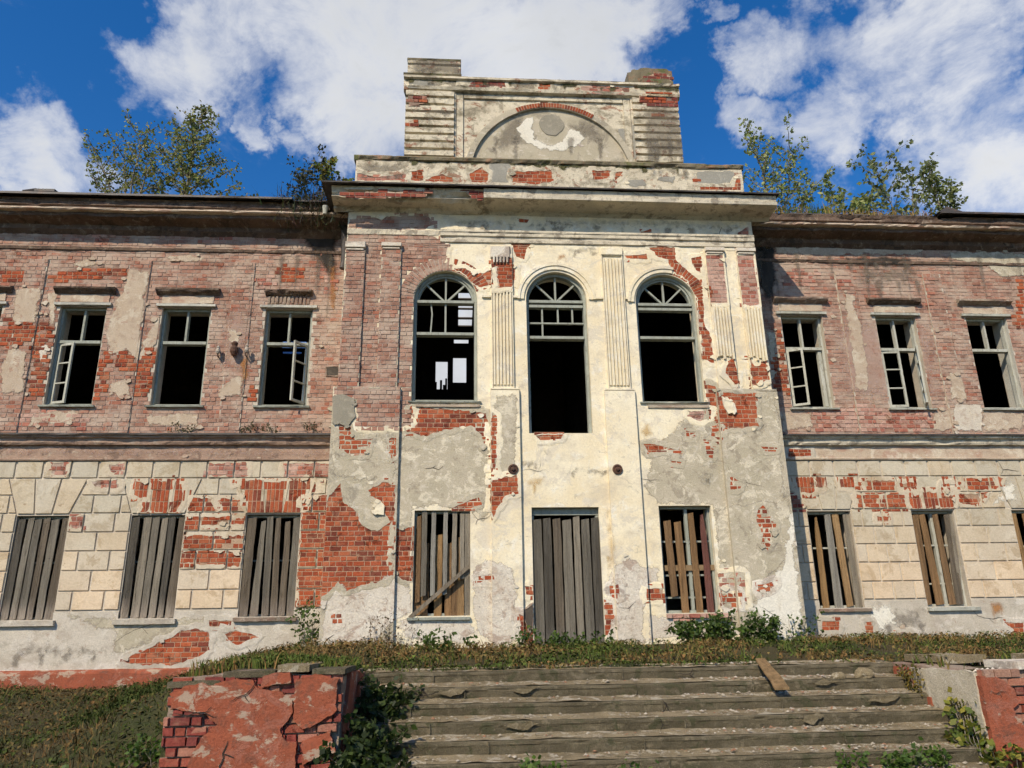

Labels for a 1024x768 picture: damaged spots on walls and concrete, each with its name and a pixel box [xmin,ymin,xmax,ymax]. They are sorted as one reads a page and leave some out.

flaking render [725,222,753,235]
flaking render [86,163,560,646]
peeling [622,246,1024,641]
flaking render [67,613,266,669]
crack [175,681,257,717]